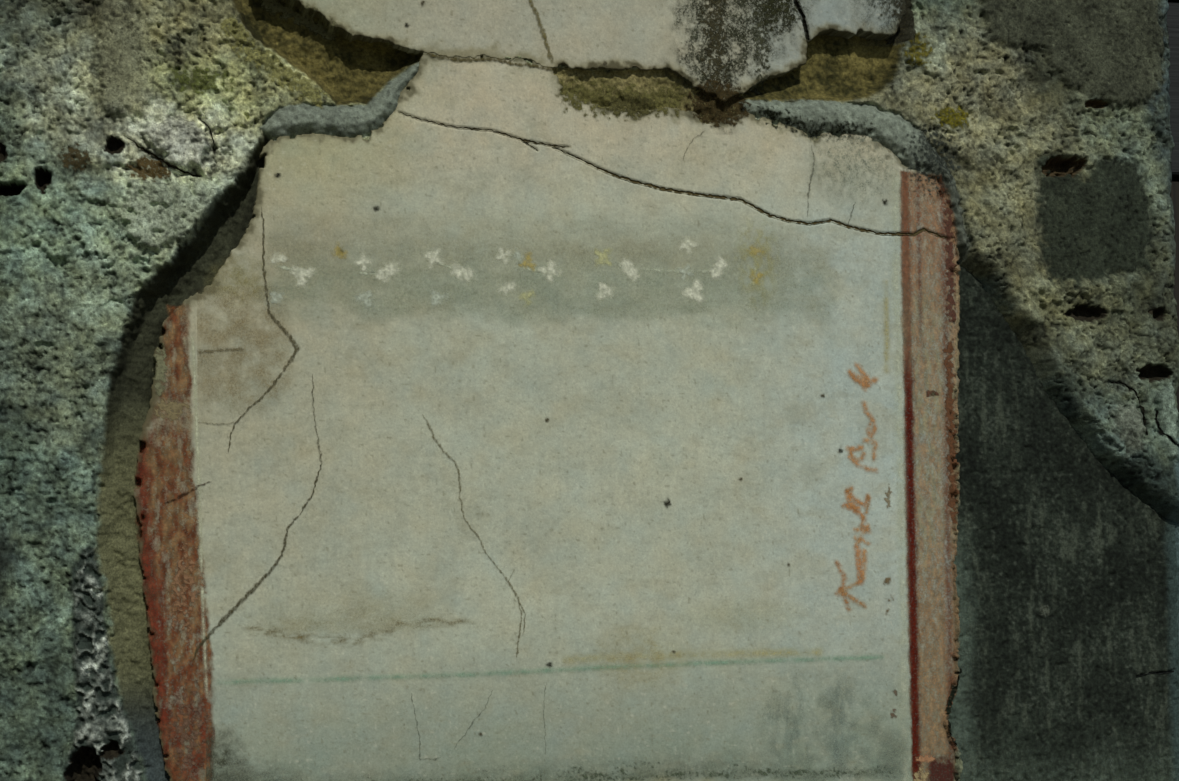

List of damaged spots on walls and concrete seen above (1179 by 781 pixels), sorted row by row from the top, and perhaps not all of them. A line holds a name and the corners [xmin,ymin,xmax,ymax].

spalling [233,0,422,106]
crack [427,0,553,70]
spalling [552,0,914,124]
water stain [676,0,887,188]
crack [795,0,810,40]
crack [398,111,948,239]
water stain [902,124,960,196]
peeling [944,200,956,322]
crack [207,212,299,452]
spalling [96,132,270,781]
peeling [927,339,960,531]
crack [193,385,322,661]